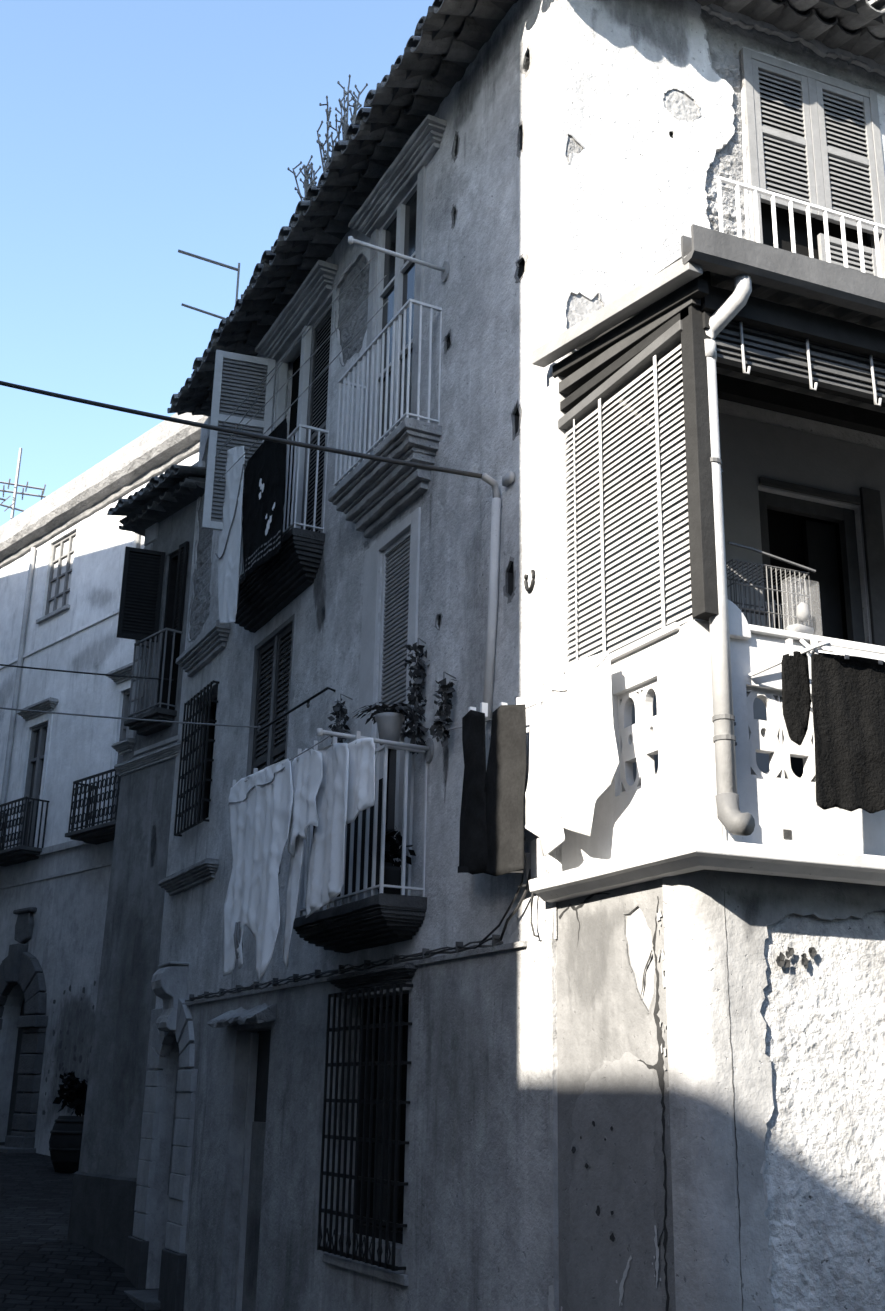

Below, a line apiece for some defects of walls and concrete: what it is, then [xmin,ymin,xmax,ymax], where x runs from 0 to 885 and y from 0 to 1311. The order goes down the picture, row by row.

flaking render [564,133,585,164]
flaking render [662,88,702,138]
flaking render [700,5,885,241]
flaking render [564,290,606,331]
flaking render [623,903,656,1015]
peeling [548,1052,663,1311]
crack [638,896,670,1311]
flaking render [760,910,885,1311]